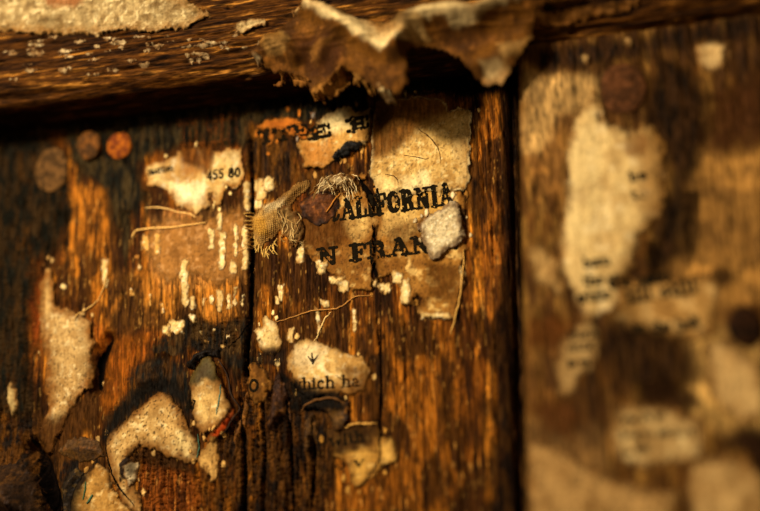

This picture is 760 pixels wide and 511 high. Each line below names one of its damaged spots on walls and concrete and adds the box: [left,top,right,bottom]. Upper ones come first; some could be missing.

peeling [27,34,58,57]
peeling [58,40,83,73]
peeling [86,37,126,61]
peeling [185,34,236,65]
peeling [243,176,273,211]
peeling [207,200,253,274]
peeling [296,240,304,264]
peeling [101,258,109,288]
peeling [316,260,348,293]
peeling [271,285,283,321]
peeling [370,270,457,322]
peeling [287,328,300,343]